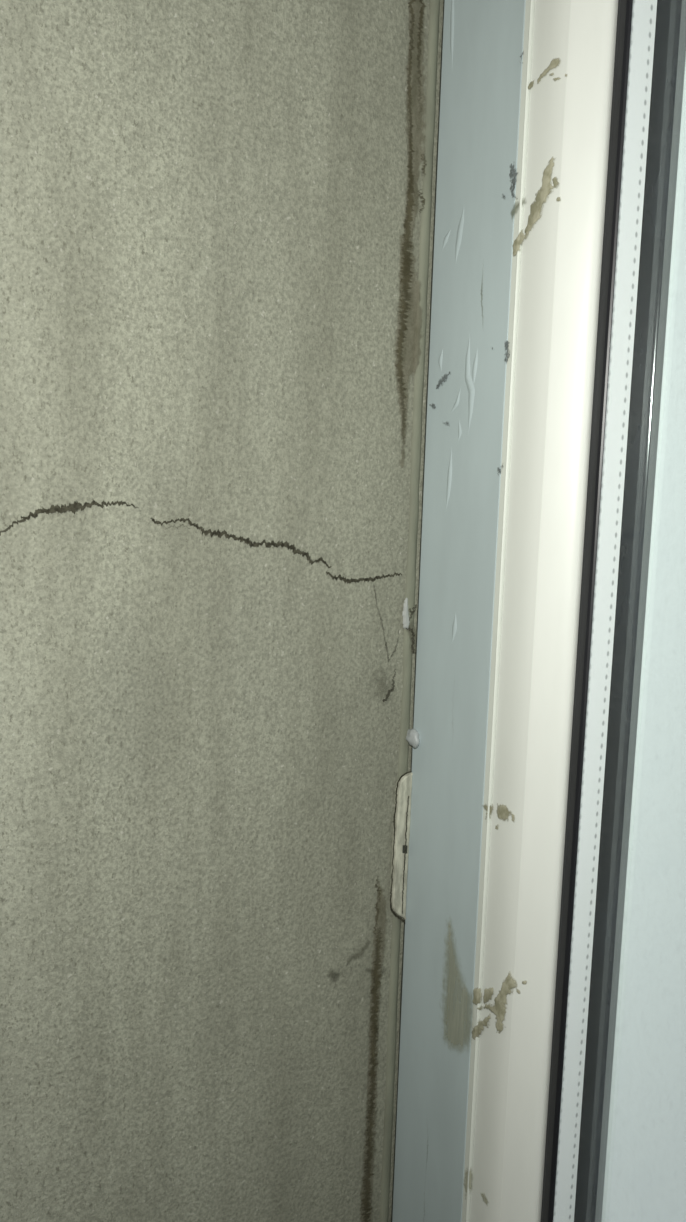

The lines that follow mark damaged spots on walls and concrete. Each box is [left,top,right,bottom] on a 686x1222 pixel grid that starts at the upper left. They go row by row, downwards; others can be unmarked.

damp [395,0,426,467]
peeling [503,163,524,216]
crack [0,500,402,596]
damp [349,882,386,1222]